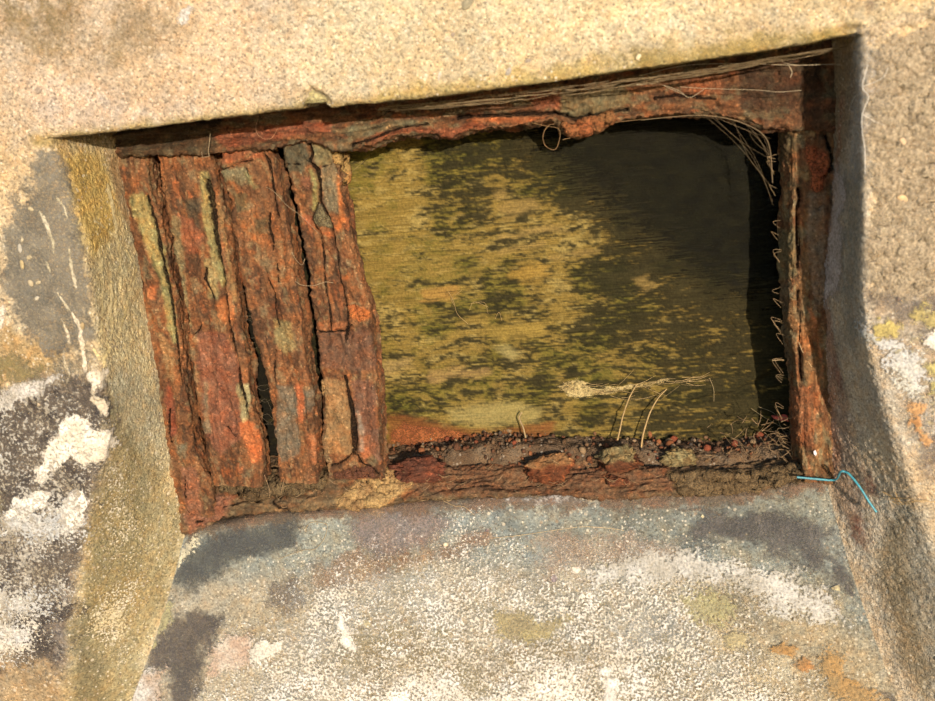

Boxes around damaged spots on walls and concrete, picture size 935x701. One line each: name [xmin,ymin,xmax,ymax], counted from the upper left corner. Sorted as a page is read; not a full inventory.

corrosion [561,110,615,138]
corrosion [332,152,352,185]
damp [0,150,137,384]
corrosion [347,304,367,322]
corrosion [391,421,473,446]
corrosion [333,465,413,512]
damp [173,518,297,593]
damp [267,579,305,614]
damp [148,611,223,701]